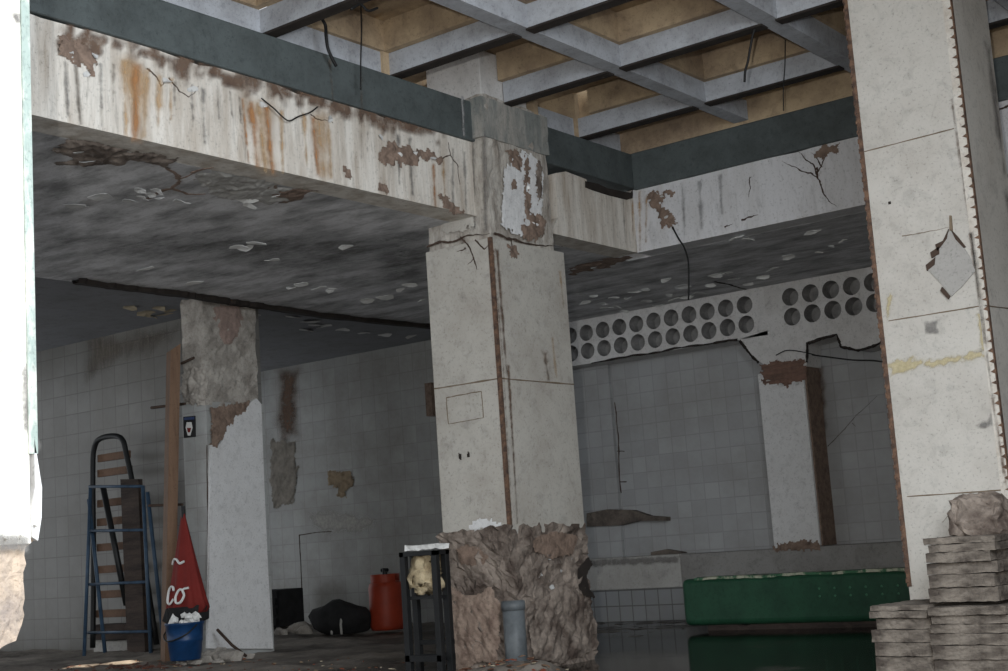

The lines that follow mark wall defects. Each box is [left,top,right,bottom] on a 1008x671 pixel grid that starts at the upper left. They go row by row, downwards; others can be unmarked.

spalling [57,24,121,77]
corrosion [124,61,161,137]
corrosion [242,100,283,171]
spalling [133,44,444,168]
corrosion [303,115,325,170]
crack [146,167,214,199]
spalling [500,148,547,259]
crack [784,146,838,206]
crack [426,232,563,269]
spalling [760,358,807,388]
crack [806,334,881,363]
spalling [436,518,599,671]